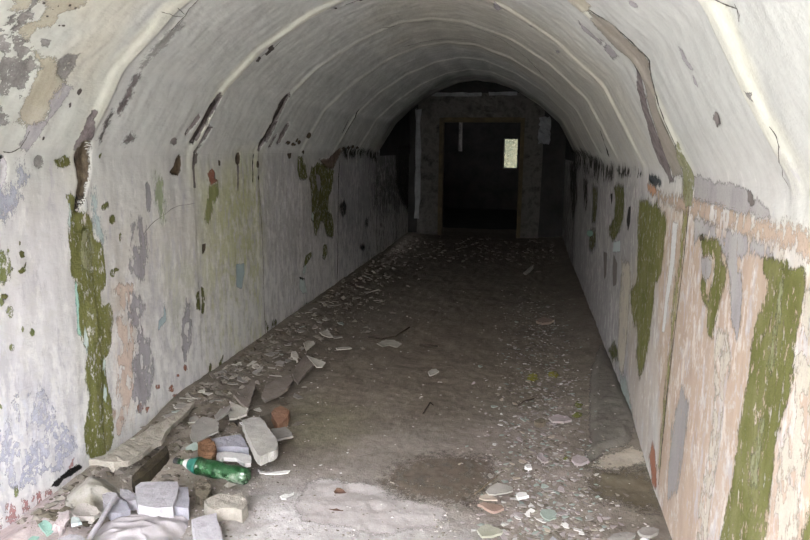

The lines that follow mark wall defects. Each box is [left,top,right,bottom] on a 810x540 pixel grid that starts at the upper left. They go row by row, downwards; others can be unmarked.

peeling [0,155,43,222]
flaking render [0,0,59,126]
peeling [19,54,82,152]
flaking render [74,23,185,213]
flaking render [170,92,223,188]
flaking render [257,92,311,159]
crack [567,0,694,208]